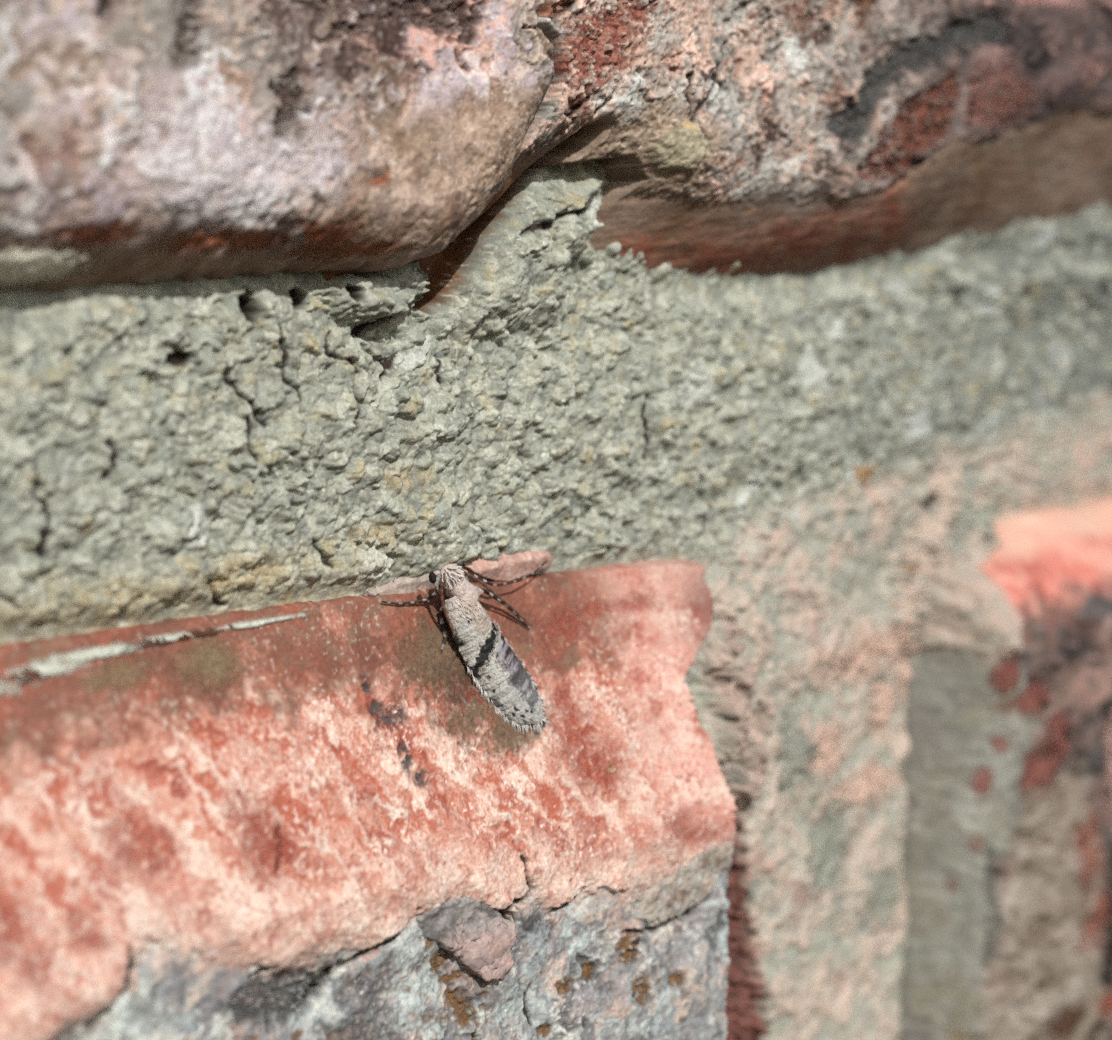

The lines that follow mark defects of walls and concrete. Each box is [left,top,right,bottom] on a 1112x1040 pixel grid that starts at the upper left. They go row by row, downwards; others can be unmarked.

peeling [634,843,735,924]
peeling [416,896,517,982]
spalling [57,1010,104,1040]
spalling [227,967,326,1024]